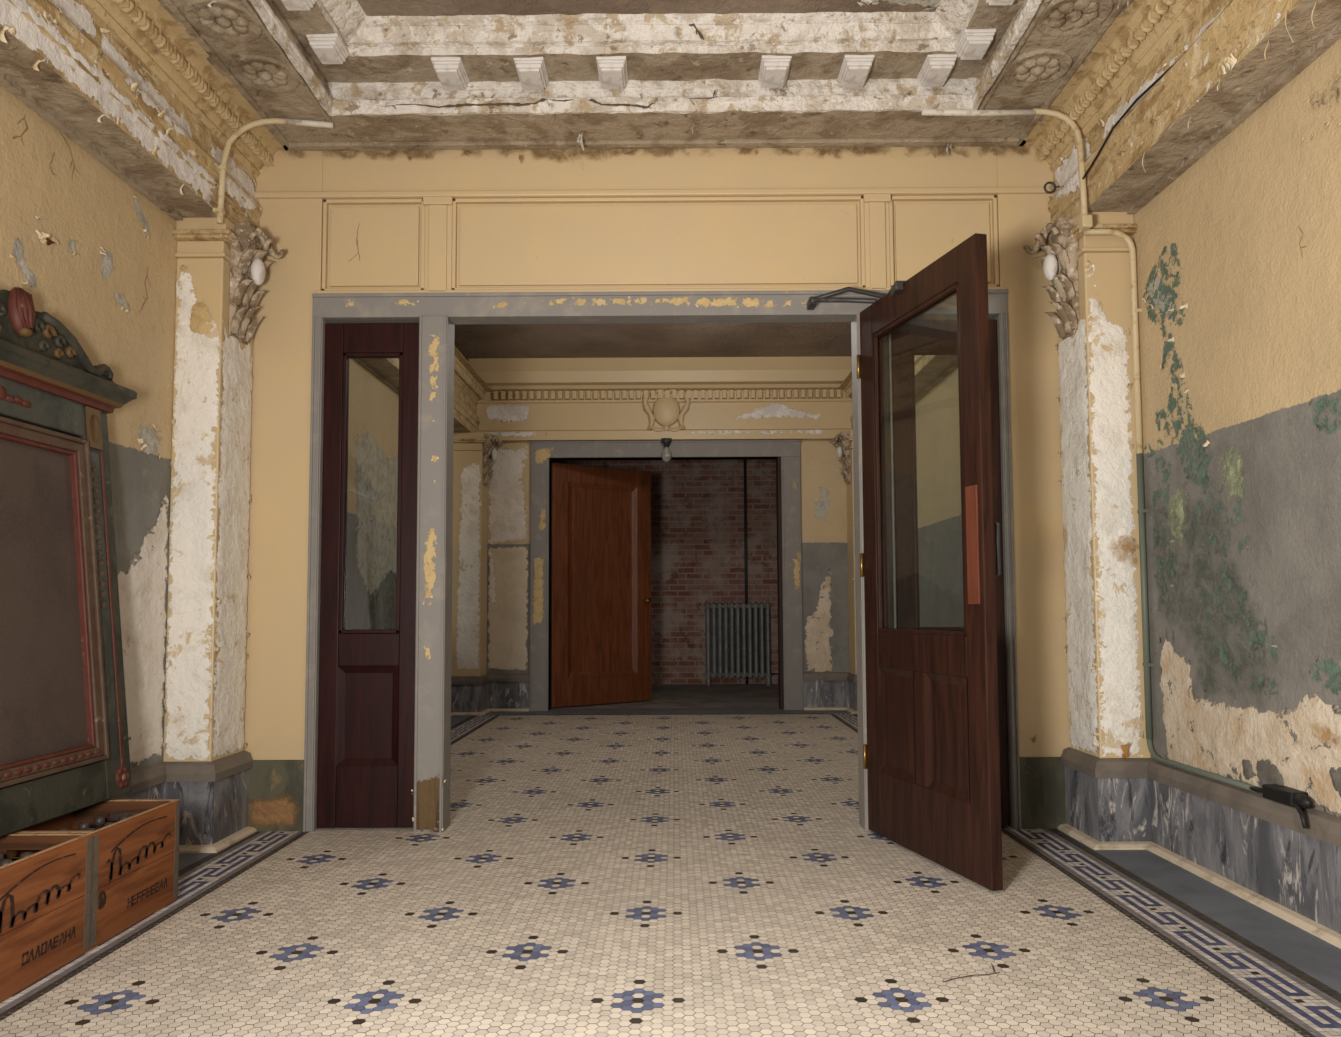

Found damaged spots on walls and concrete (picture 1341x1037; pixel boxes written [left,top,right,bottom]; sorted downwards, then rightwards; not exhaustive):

peeling [0,0,262,211]
peeling [1049,9,1223,202]
peeling [1188,9,1293,129]
peeling [542,296,806,308]
peeling [118,265,253,767]
peeling [804,568,833,672]
peeling [1055,243,1250,757]
leakage [1156,489,1260,688]
peeling [1308,394,1341,434]
peeling [1159,637,1341,817]